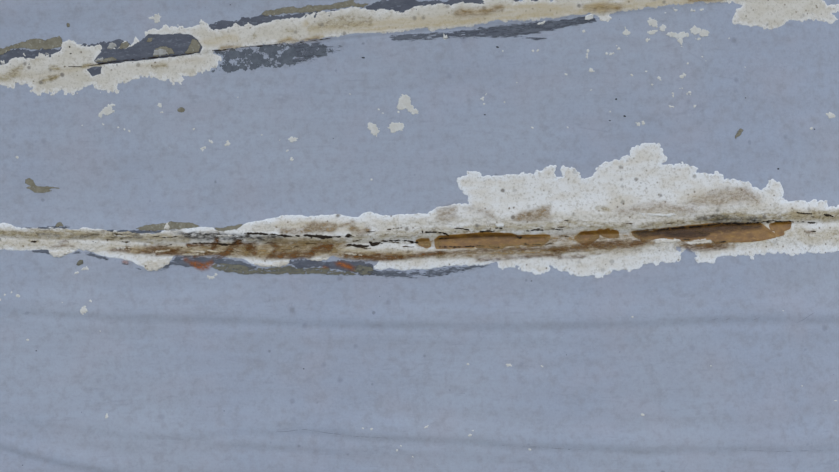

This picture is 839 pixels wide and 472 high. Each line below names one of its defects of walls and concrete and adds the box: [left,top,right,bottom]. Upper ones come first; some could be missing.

peeling [0,0,839,125]
peeling [367,94,418,137]
crack [149,220,569,252]
peeling [0,143,839,279]
rust [117,225,761,270]
crack [626,212,834,243]